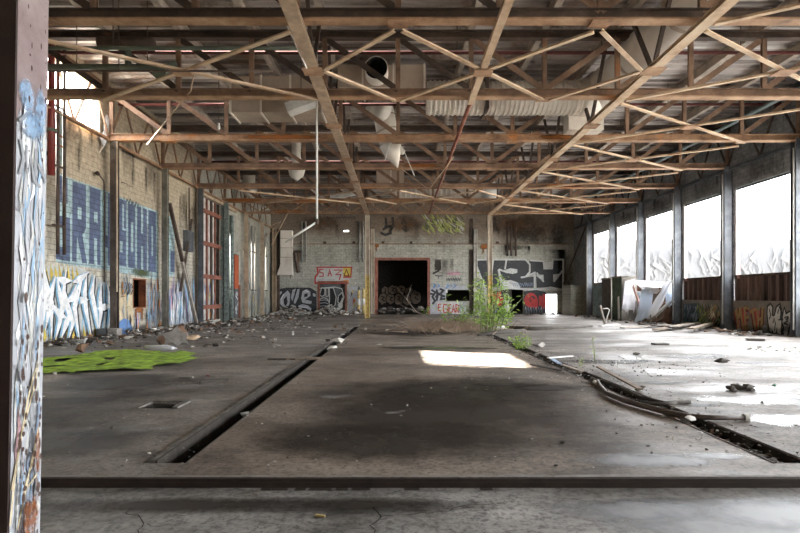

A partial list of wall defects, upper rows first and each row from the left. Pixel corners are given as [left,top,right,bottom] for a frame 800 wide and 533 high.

damp [290,379,591,458]